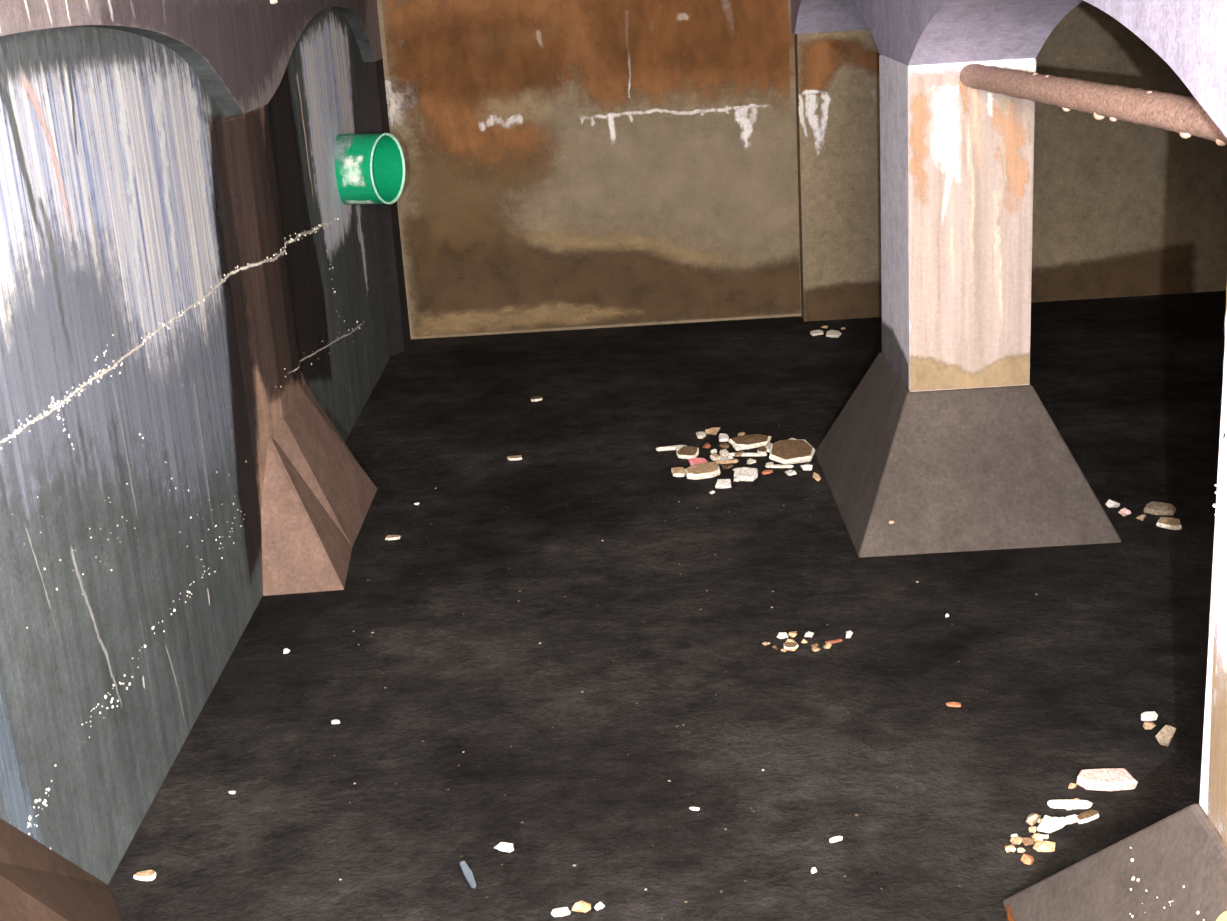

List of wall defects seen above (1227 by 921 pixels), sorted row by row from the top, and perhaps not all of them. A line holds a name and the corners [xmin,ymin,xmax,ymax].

crack [0,218,363,449]
water stain [0,0,368,578]
corrosion [382,0,881,172]
water stain [548,80,831,247]
water stain [407,146,1030,391]
efflorescence [931,85,961,219]
corrosion [908,69,1035,392]
water stain [1031,244,1194,302]
water stain [60,550,121,702]
crack [82,509,244,738]
water stain [1207,293,1227,847]
crack [27,764,57,849]